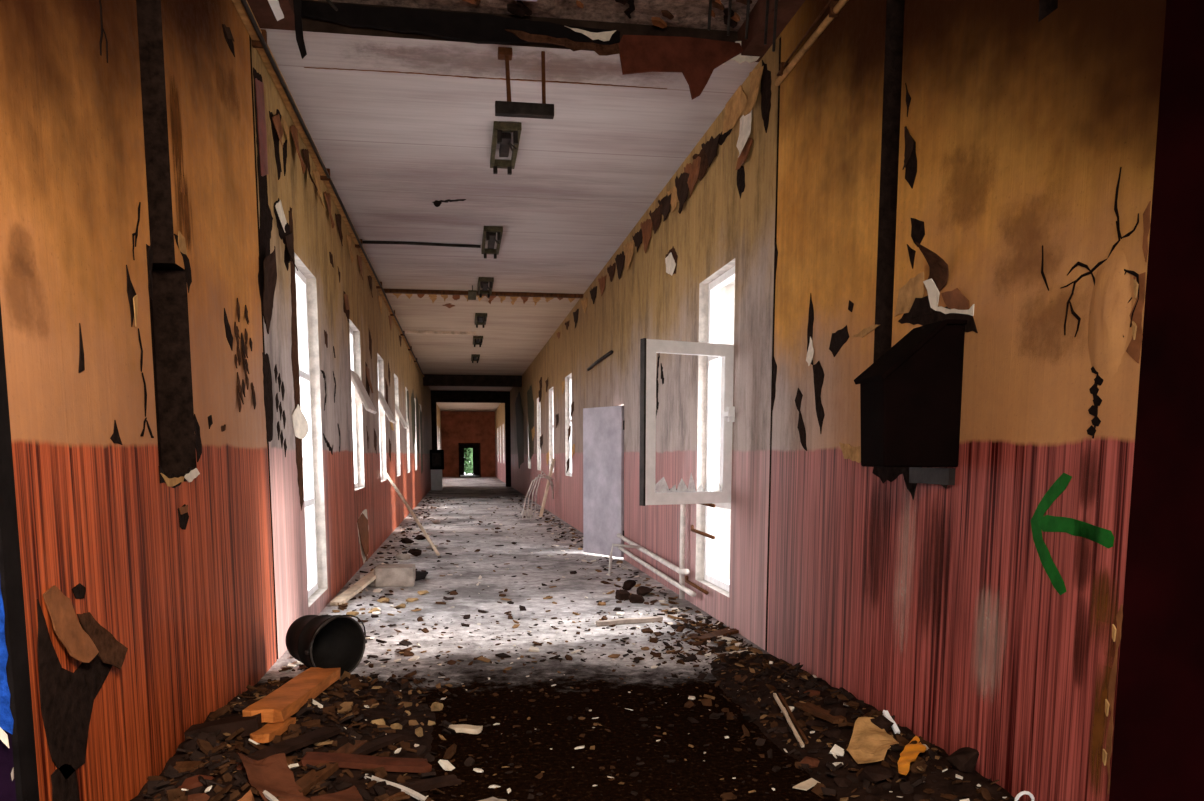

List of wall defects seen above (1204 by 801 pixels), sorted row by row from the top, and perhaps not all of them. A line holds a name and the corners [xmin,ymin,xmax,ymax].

peeling [902,83,917,189]
peeling [126,235,153,327]
spalling [174,231,192,293]
peeling [224,60,772,511]
crack [1041,167,1139,337]
spalling [159,414,226,488]
crack [1087,367,1103,438]
water stain [866,489,888,601]
peeling [0,589,14,748]
peeling [37,583,128,801]